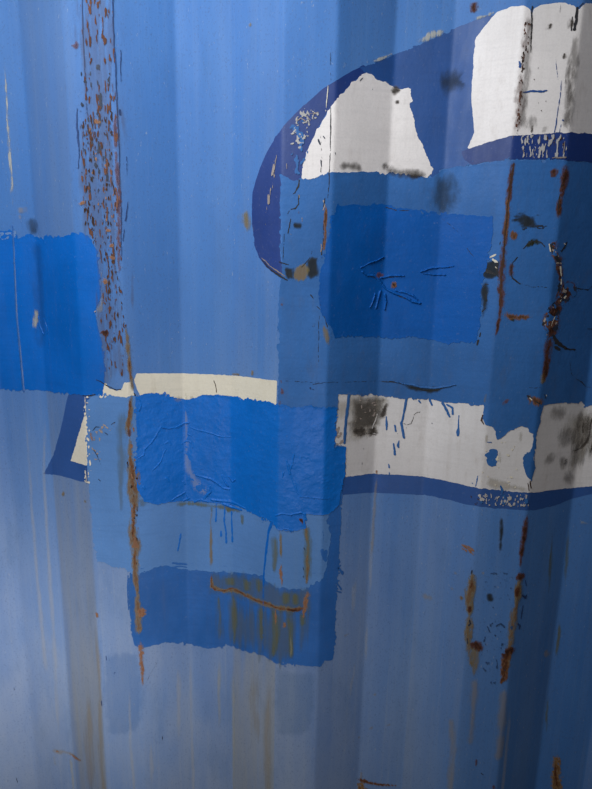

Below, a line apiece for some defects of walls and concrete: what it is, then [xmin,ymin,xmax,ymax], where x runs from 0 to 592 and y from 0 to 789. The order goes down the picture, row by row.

peeling [521,66,567,158]
peeling [288,108,319,233]
rust [550,167,569,215]
peeling [286,244,322,280]
rust [495,163,529,334]
rust [73,0,146,633]
peeling [471,469,532,507]
rust [210,576,309,655]
rust [273,536,283,584]
rust [460,570,483,672]
rust [500,517,528,684]
rust [551,757,563,789]